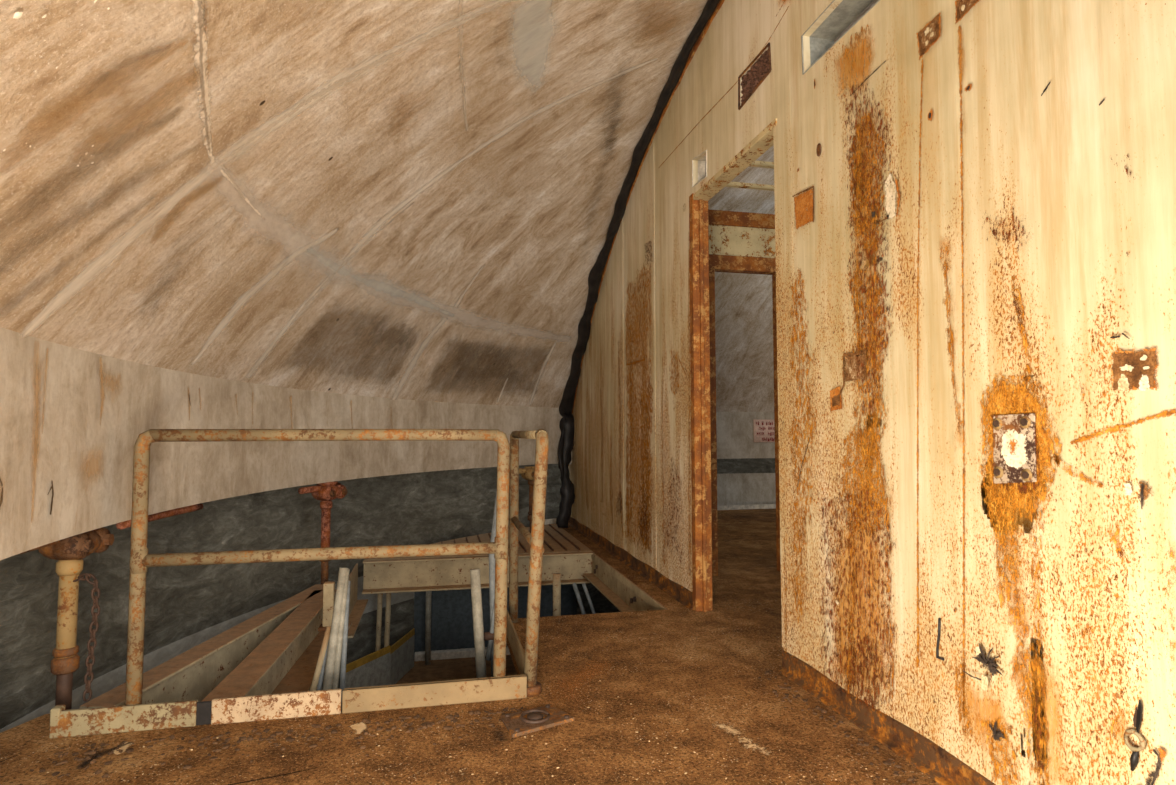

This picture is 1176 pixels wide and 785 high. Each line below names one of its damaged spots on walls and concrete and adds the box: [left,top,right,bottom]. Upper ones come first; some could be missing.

water stain [23,0,658,405]
rust [585,242,691,571]
rust [784,25,897,715]
rust [916,59,933,667]
rust [940,25,1176,785]